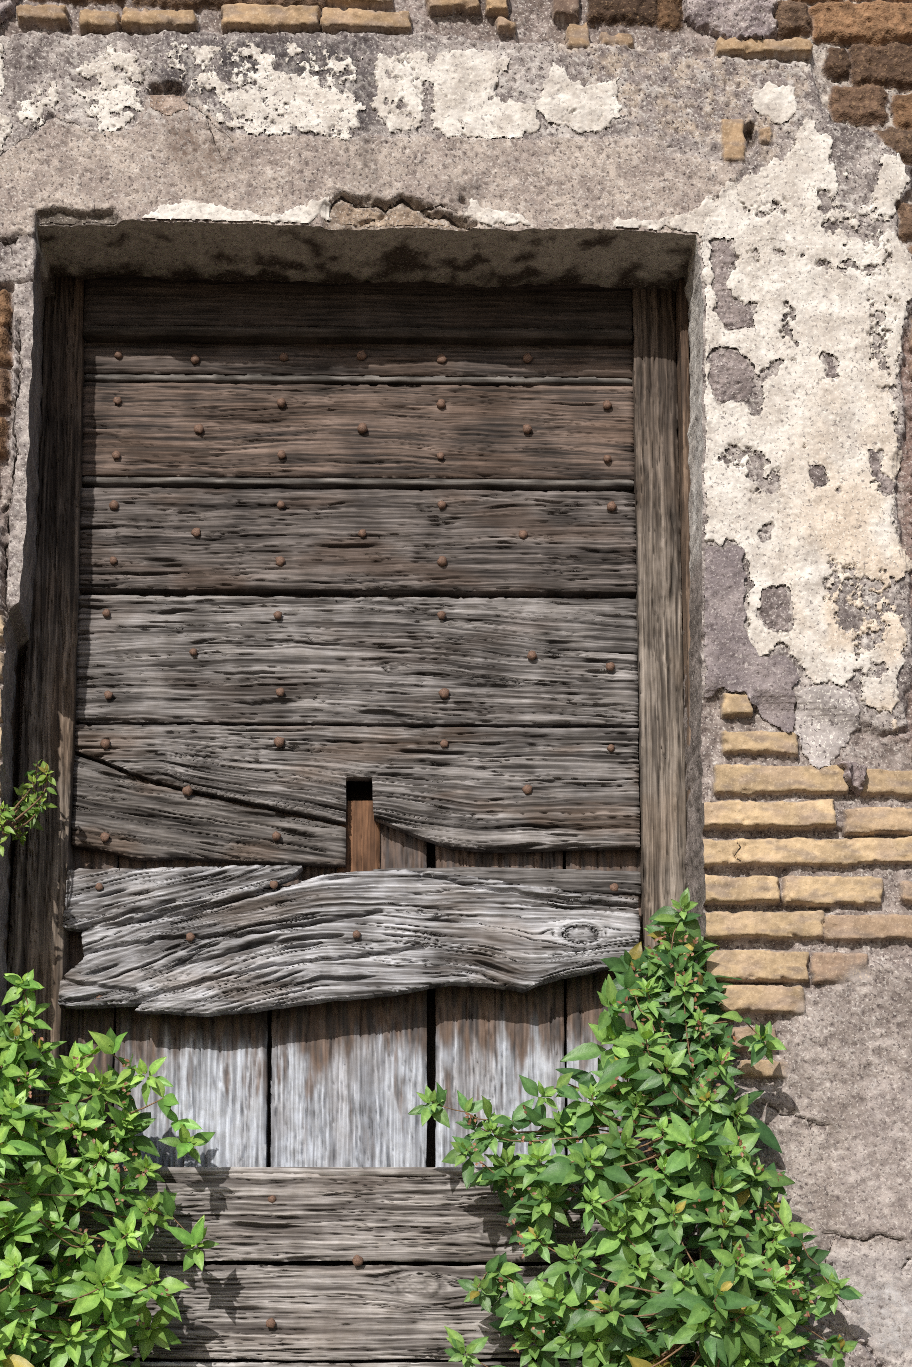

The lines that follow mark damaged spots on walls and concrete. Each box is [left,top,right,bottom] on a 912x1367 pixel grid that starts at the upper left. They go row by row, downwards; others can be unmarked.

peeling [0,34,623,150]
spalling [38,209,115,224]
peeling [142,197,531,228]
peeling [612,81,912,770]
crack [824,1233,908,1309]